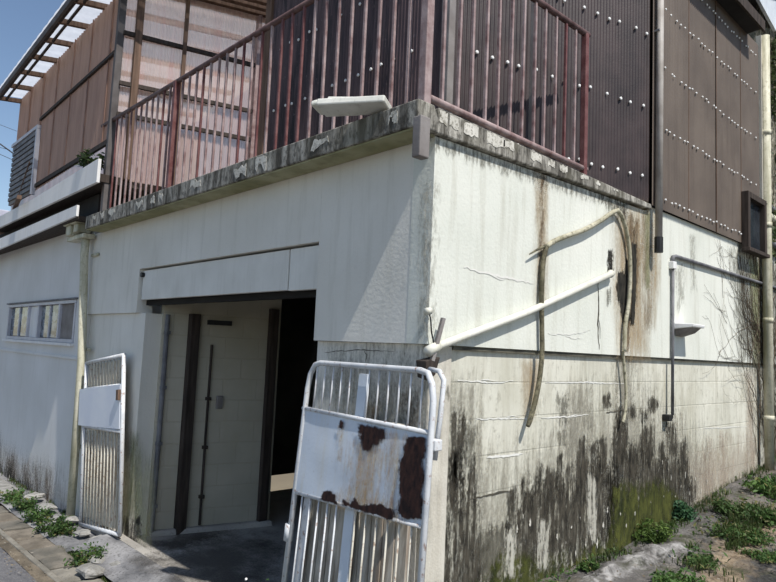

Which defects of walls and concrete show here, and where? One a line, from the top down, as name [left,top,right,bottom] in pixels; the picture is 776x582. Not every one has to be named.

peeling [233,155,267,179]
peeling [311,136,329,152]
peeling [439,110,514,151]
peeling [531,152,568,173]
crack [549,288,600,350]
leakage [430,135,708,582]
leakage [335,359,418,426]
corrosion [529,364,537,408]
leakage [0,456,50,500]